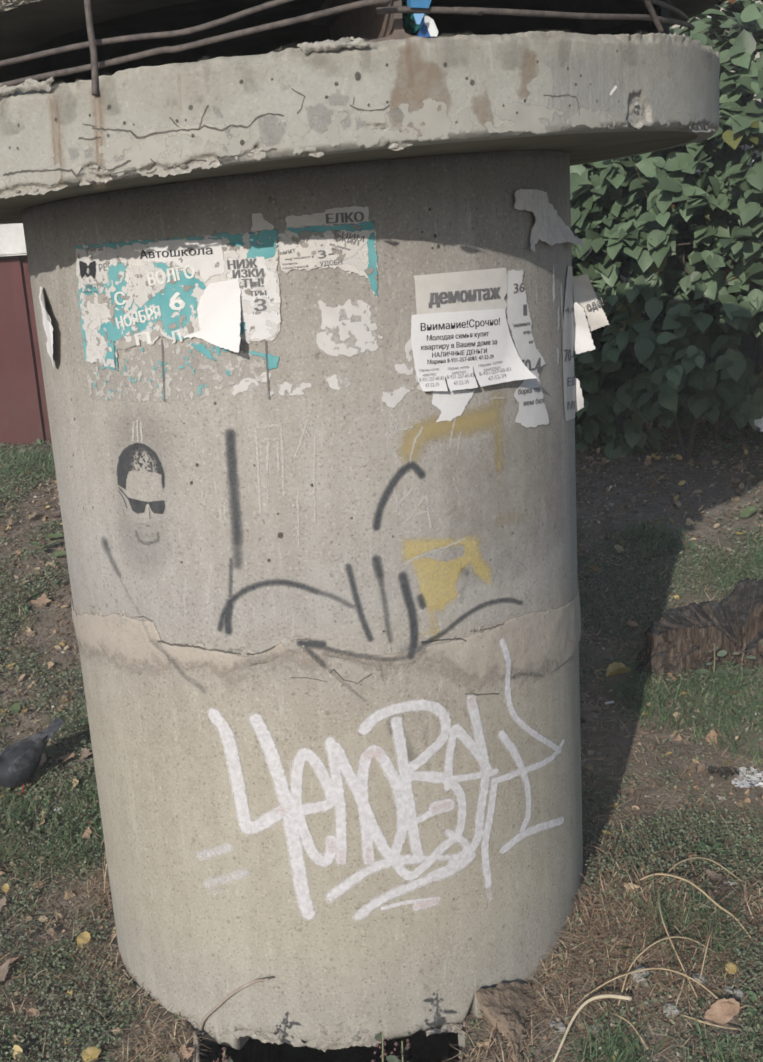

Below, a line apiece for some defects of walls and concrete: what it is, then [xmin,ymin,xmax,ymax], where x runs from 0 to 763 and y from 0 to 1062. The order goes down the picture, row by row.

spalling [0,0,43,12]
peeling [0,105,266,199]
crack [3,88,306,185]
crack [350,99,390,112]
peeling [276,90,717,157]
crack [135,616,275,655]
crack [291,669,372,684]
spalling [148,988,385,1052]